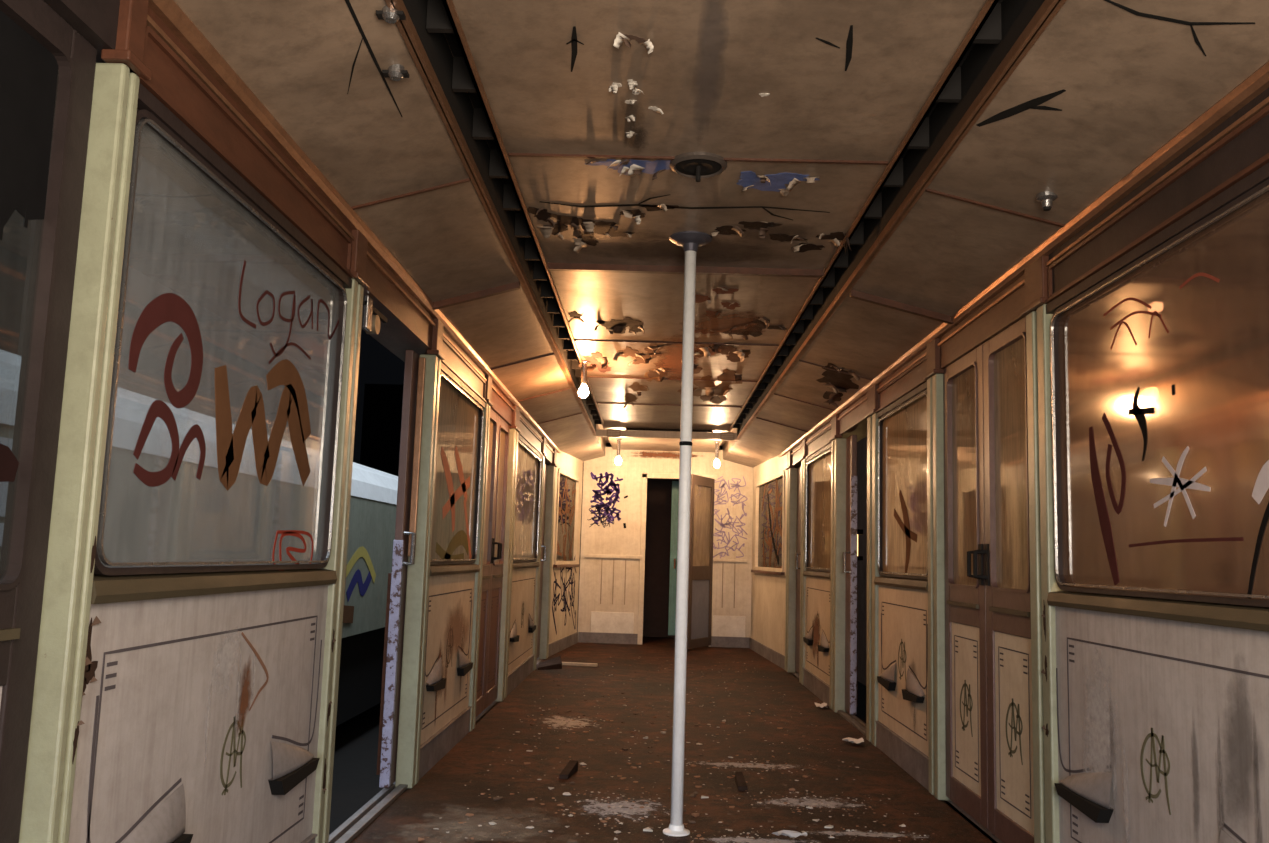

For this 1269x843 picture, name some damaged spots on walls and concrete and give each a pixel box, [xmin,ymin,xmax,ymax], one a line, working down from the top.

peeling [736,171,819,197]
peeling [528,204,679,253]
peeling [711,221,852,252]
peeling [568,311,668,408]
peeling [677,287,787,404]